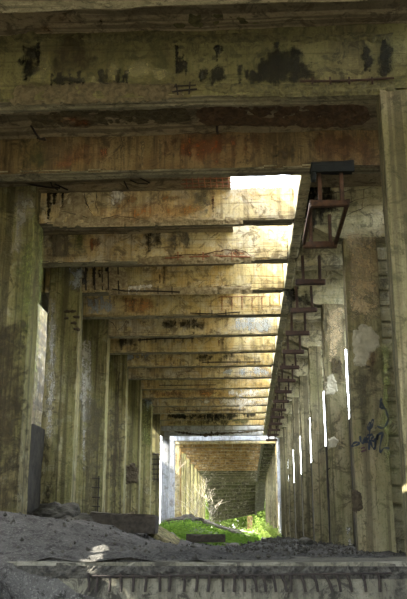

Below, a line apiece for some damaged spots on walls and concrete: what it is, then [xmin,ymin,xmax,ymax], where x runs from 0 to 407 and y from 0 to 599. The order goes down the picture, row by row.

leakage [18,40,40,80]
leakage [237,42,314,86]
leakage [361,39,394,77]
spalling [27,104,370,141]
leakage [46,192,68,219]
leakage [162,319,204,333]